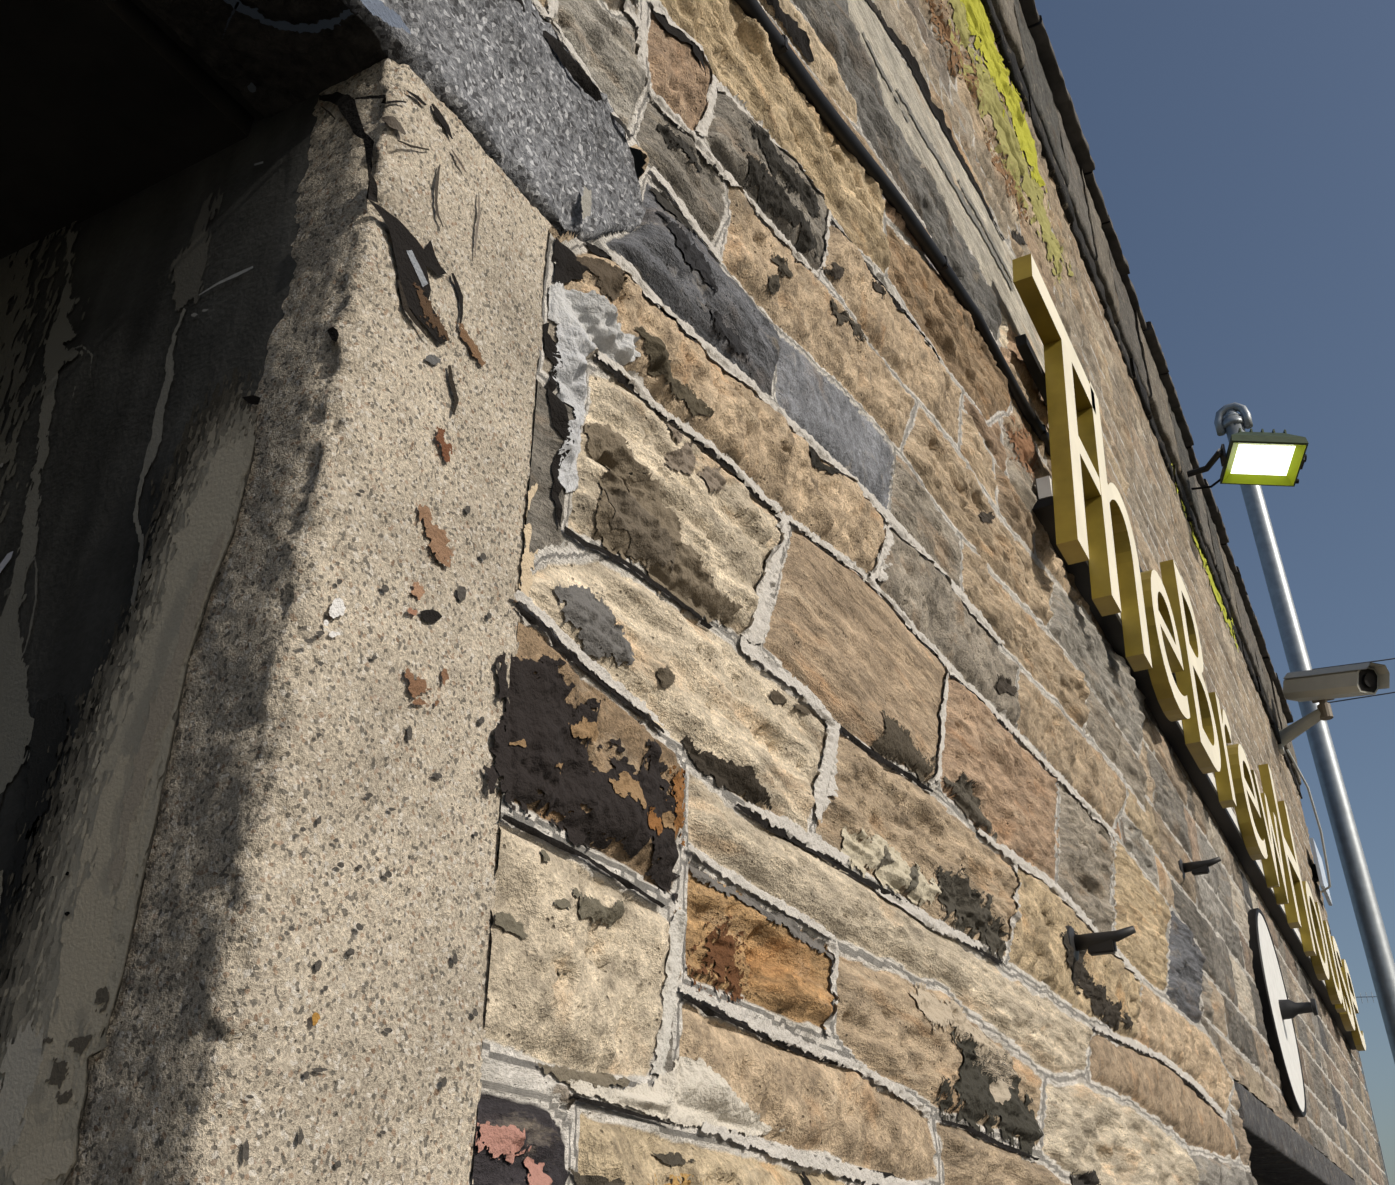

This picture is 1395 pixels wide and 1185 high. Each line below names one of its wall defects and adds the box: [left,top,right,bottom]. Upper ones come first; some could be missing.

spalling [381,116,406,135]
leakage [863,31,1015,291]
leakage [1012,229,1028,246]
spalling [369,200,447,365]
peeling [11,1138,74,1185]